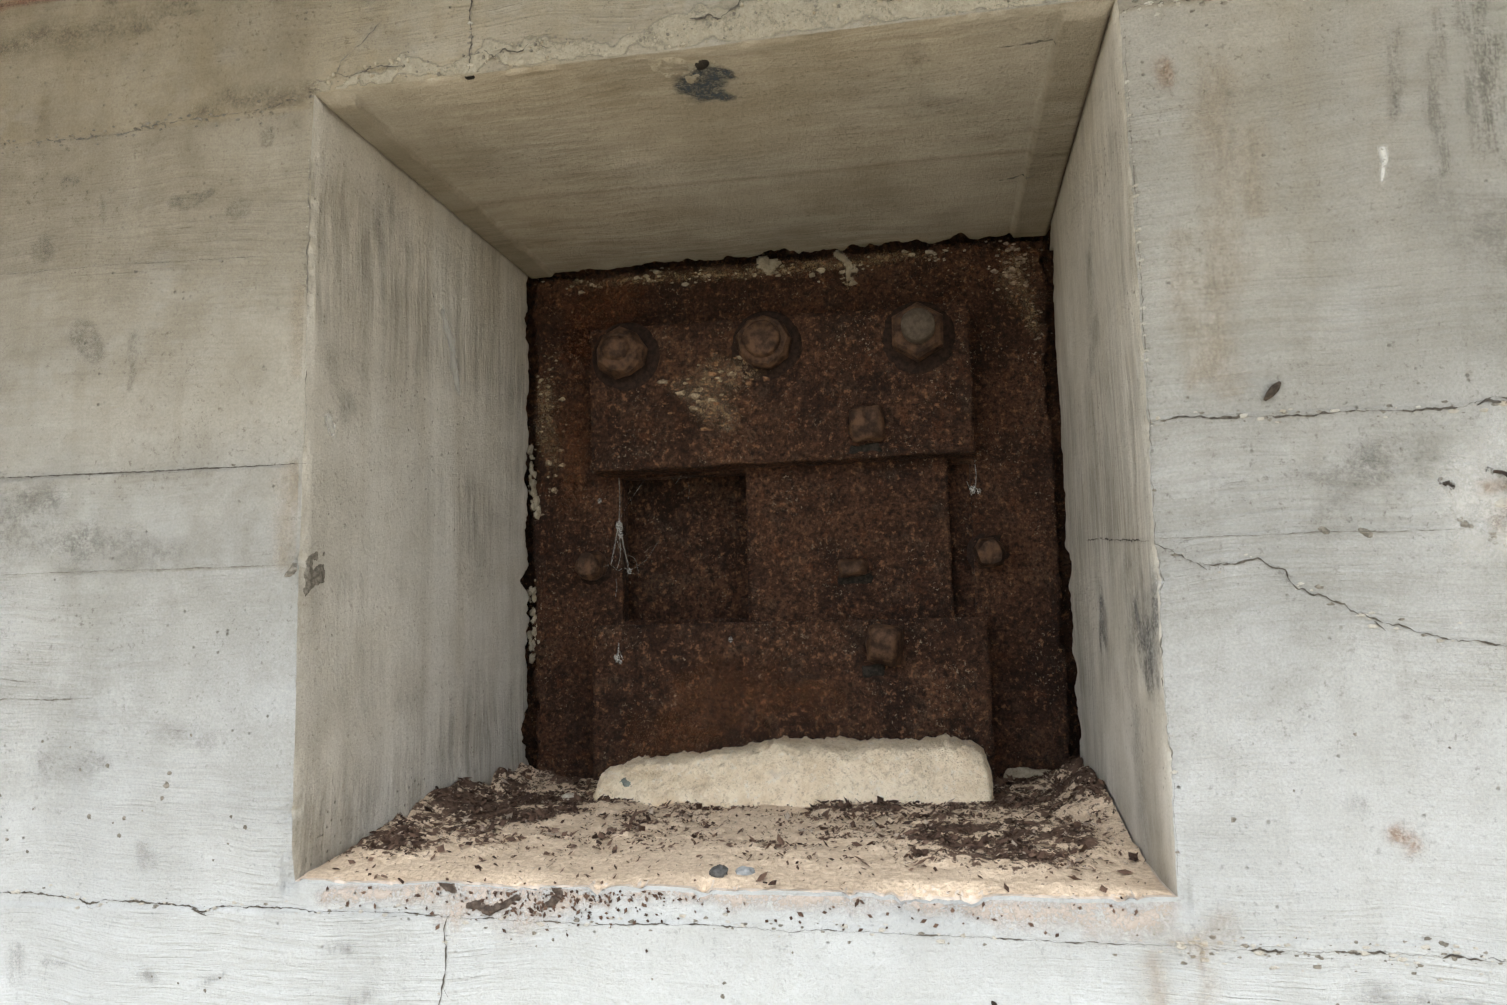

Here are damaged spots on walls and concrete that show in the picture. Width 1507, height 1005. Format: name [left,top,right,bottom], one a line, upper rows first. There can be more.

crack [467,0,551,69]
spalling [37,0,1065,147]
spalling [1123,37,1212,445]
crack [1086,537,1503,654]
crack [3,884,1506,1005]